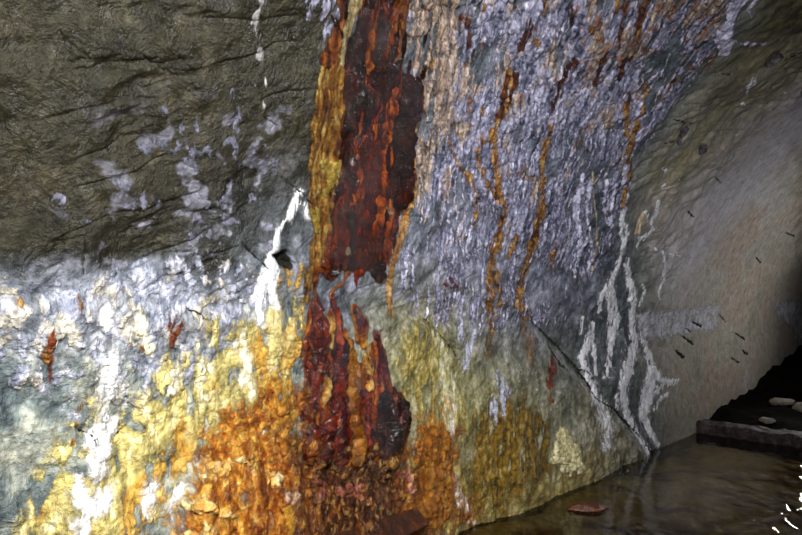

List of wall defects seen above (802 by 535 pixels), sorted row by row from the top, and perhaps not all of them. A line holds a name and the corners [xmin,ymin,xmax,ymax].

water stain [138,88,241,171]
rust [514,18,541,59]
rust [550,56,579,114]
rust [592,0,630,92]
rust [620,84,651,209]
rust [448,68,554,368]
water stain [390,0,767,535]
rust [40,329,57,384]
water stain [0,179,311,535]
rust [168,317,184,348]
crack [527,309,652,454]
rust [409,424,464,530]